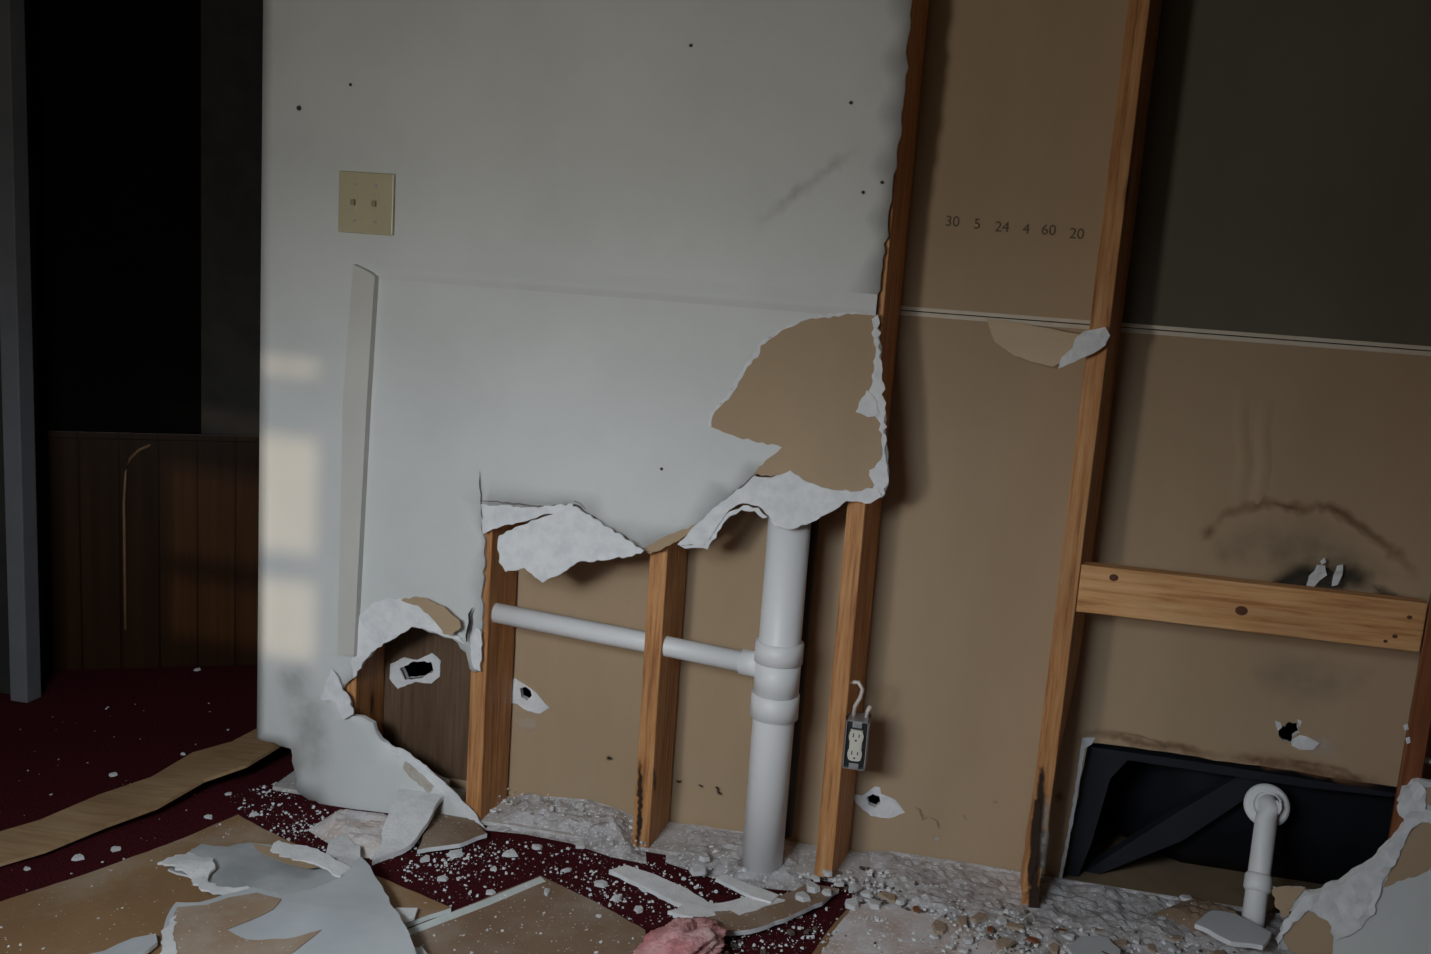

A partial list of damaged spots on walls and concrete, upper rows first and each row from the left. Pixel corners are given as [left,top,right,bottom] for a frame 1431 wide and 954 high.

spalling [901,310,1090,325]
spalling [1122,327,1431,351]
damp [1275,567,1363,588]
spalling [320,596,483,719]
spalling [381,739,486,830]